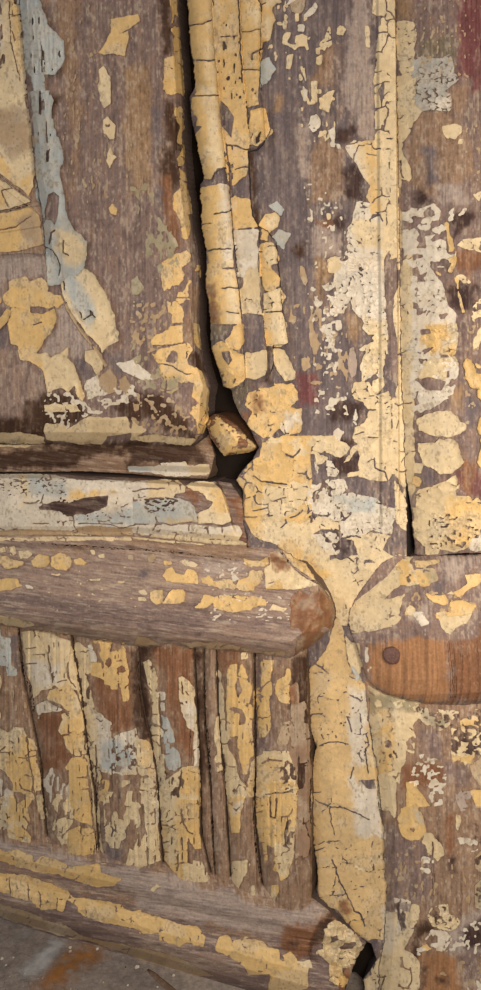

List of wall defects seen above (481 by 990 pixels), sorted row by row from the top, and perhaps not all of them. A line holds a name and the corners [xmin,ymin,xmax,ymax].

peeling [0,0,256,456]
peeling [0,578,33,591]
peeling [0,461,246,576]
peeling [130,589,185,607]
peeling [162,0,481,990]
peeling [0,615,213,976]